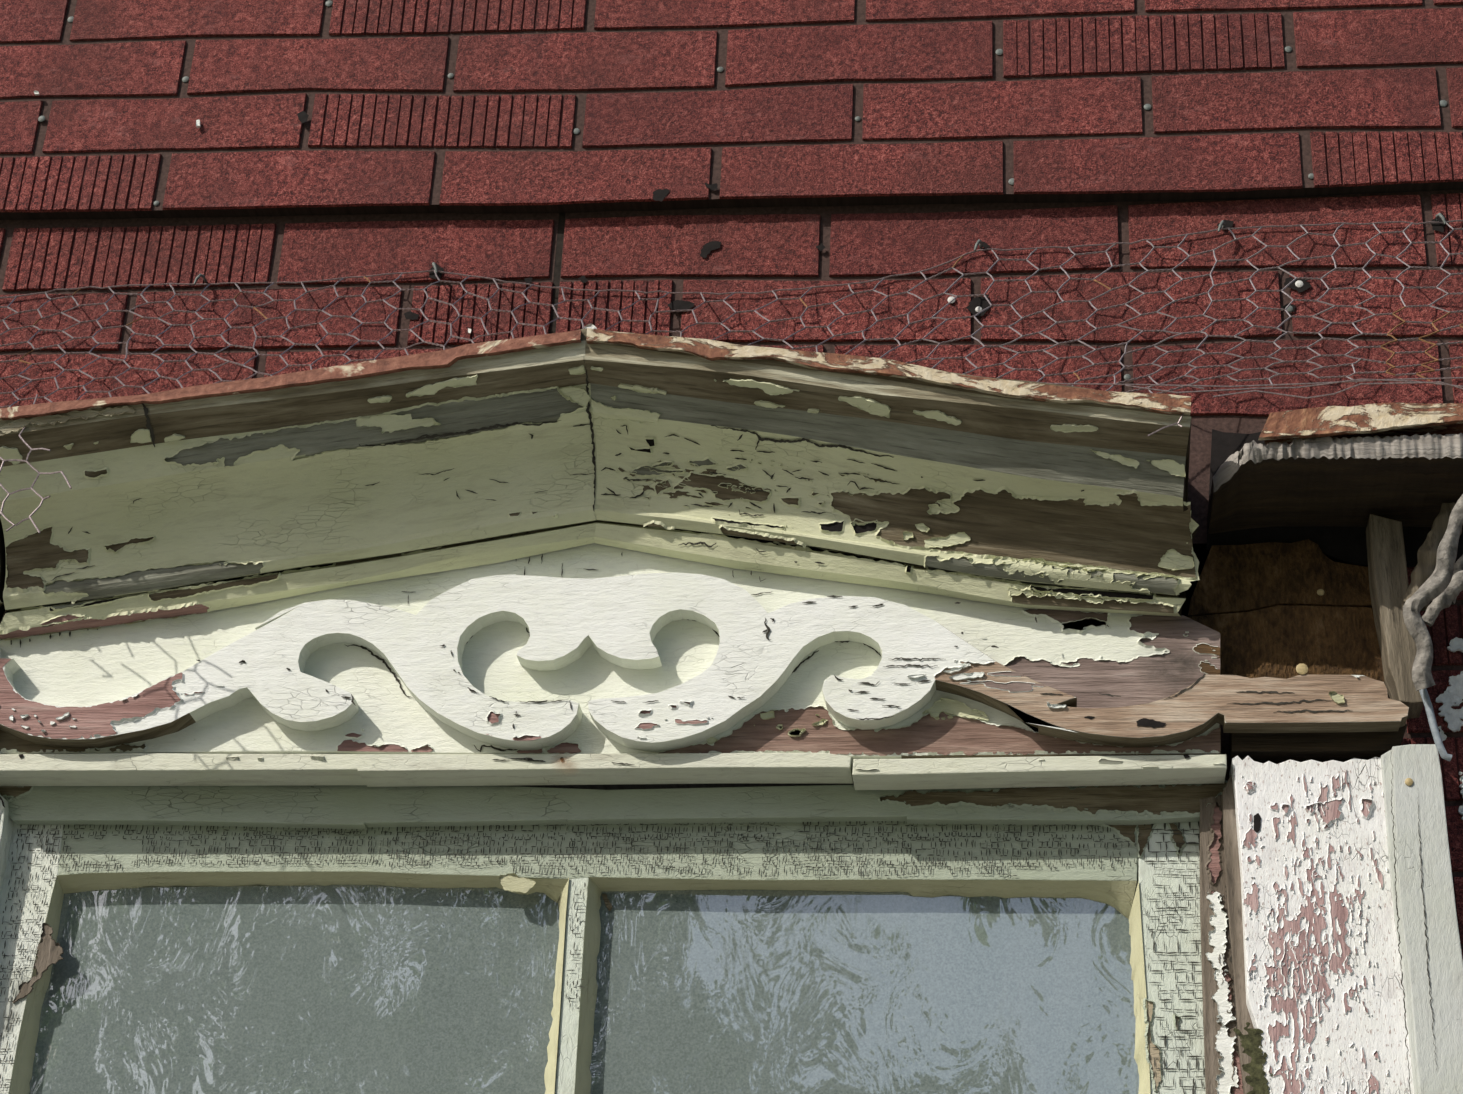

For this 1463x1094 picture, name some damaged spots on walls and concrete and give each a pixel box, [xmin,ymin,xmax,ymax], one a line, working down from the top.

crack [0,797,1243,1094]
peeling [0,365,1409,1094]